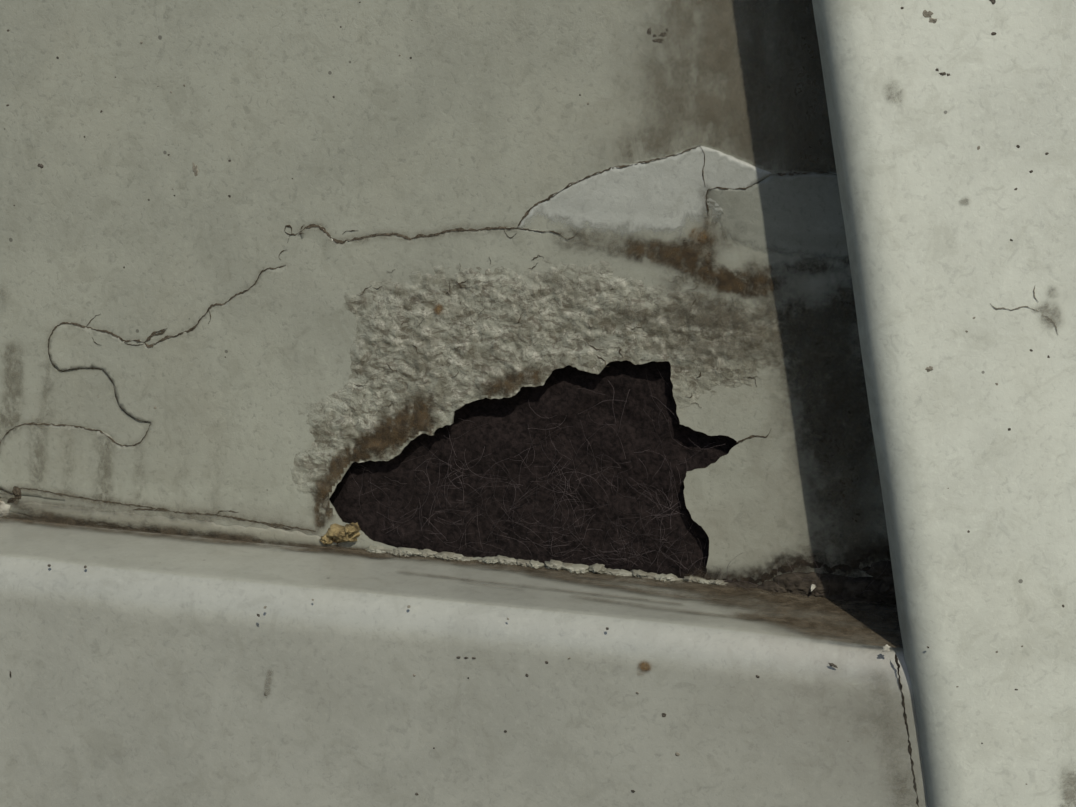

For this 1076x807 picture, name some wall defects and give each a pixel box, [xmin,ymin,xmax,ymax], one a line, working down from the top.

leakage [695,0,837,173]
crack [0,146,837,446]
rust [627,221,775,296]
peeling [0,265,295,518]
leakage [672,254,882,562]
crack [0,488,315,534]
peeling [365,545,726,586]